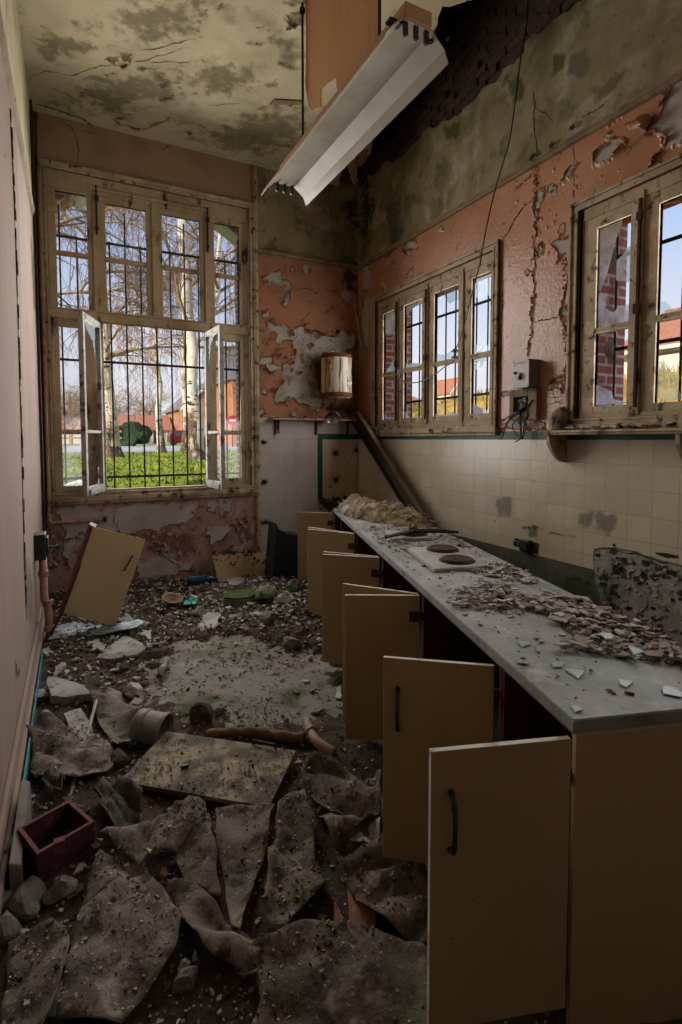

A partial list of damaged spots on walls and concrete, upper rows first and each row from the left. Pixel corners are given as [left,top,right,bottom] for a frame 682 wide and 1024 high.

crack [30,39,191,79]
flaking render [360,0,582,187]
peeling [531,72,682,221]
crack [503,93,568,404]
peeling [535,222,569,269]
peeling [259,265,372,418]
peeling [47,496,237,582]